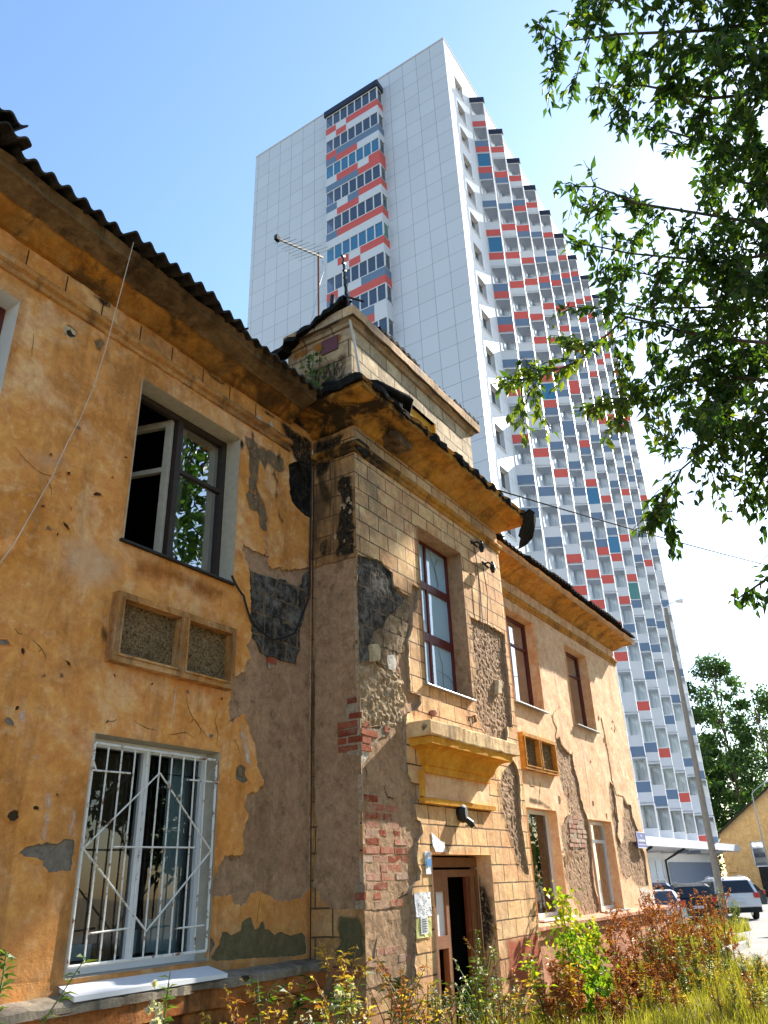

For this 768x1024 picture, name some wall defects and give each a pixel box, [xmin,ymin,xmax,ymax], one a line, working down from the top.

flaking render [284,458,313,520]
peeling [466,614,514,741]
peeling [10,832,78,878]
peeling [205,533,437,1004]
peeling [552,707,600,915]
peeling [598,716,649,889]